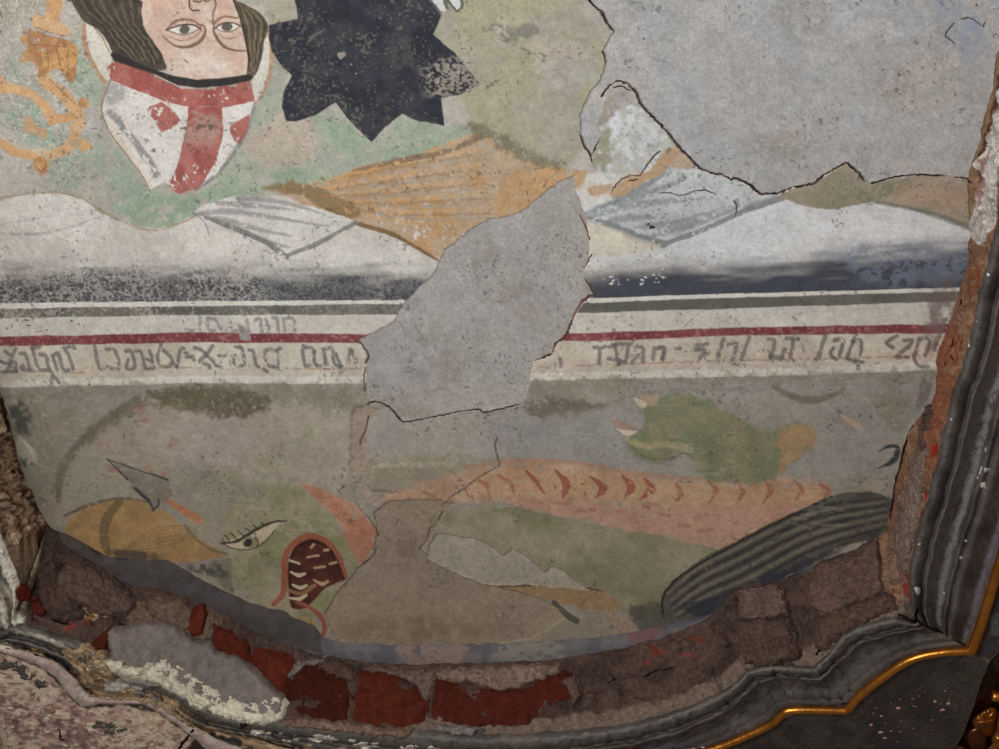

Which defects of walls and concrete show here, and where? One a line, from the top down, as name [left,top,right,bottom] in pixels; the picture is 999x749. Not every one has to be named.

crack [579,134,599,162]
crack [588,0,971,218]
crack [354,339,521,445]
crack [419,437,500,550]
peeling [0,658,48,728]
crack [177,724,196,749]